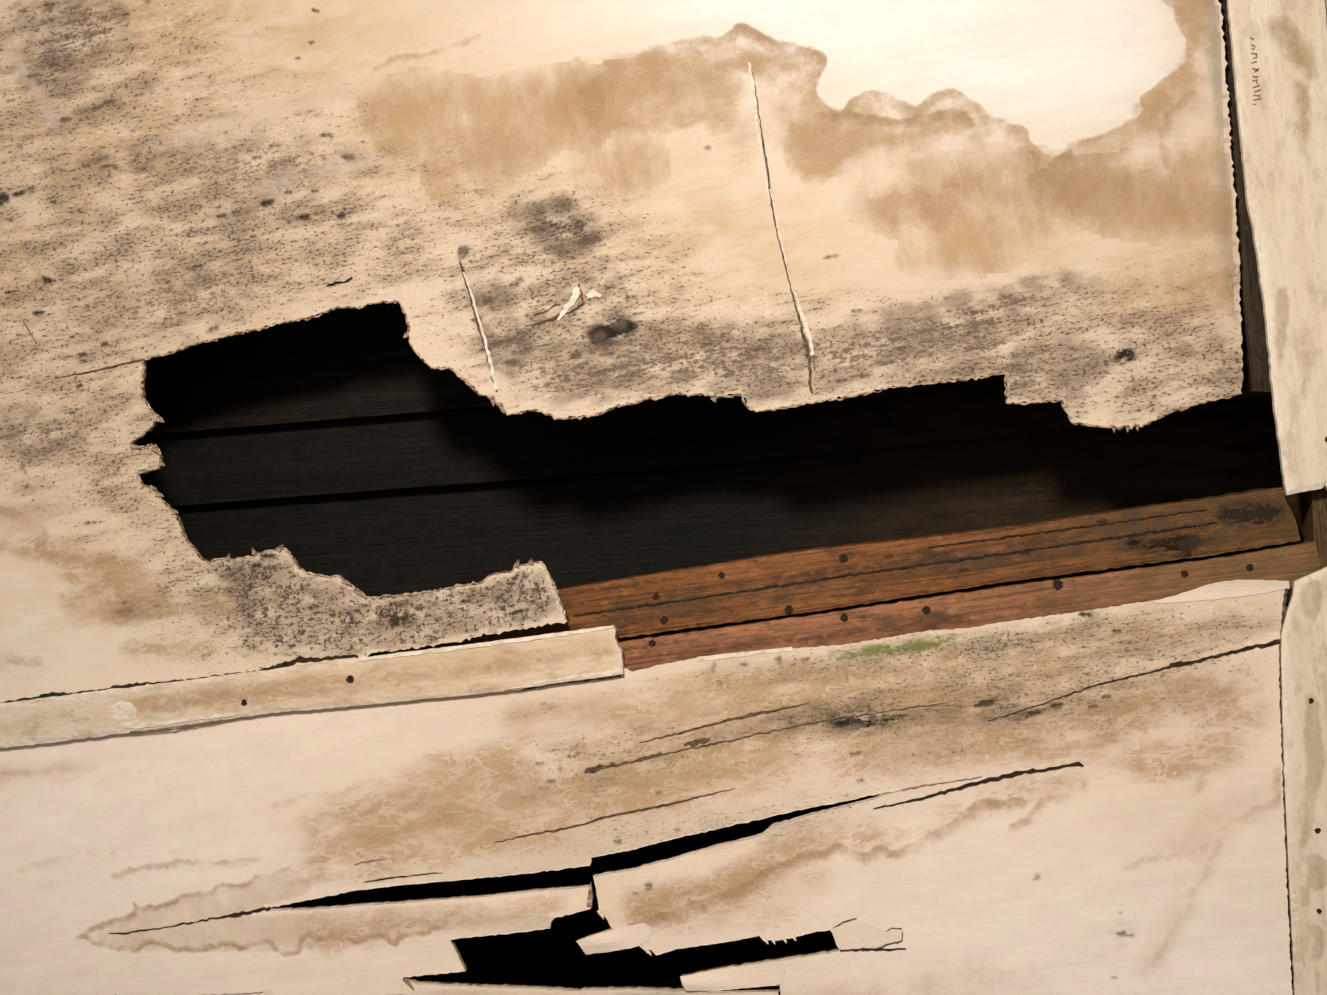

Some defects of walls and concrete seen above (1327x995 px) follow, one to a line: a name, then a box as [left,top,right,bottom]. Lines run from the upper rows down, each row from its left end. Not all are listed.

crack [748,62,815,393]
mould [472,278,794,395]
leakage [828,284,1134,391]
mould [214,553,552,654]
peeling [1151,579,1289,603]
crack [2,654,358,703]
peeling [357,625,614,662]
crack [522,676,621,691]
peeling [697,647,793,661]
crack [584,702,948,773]
leakage [430,658,1156,853]
crack [496,788,734,842]